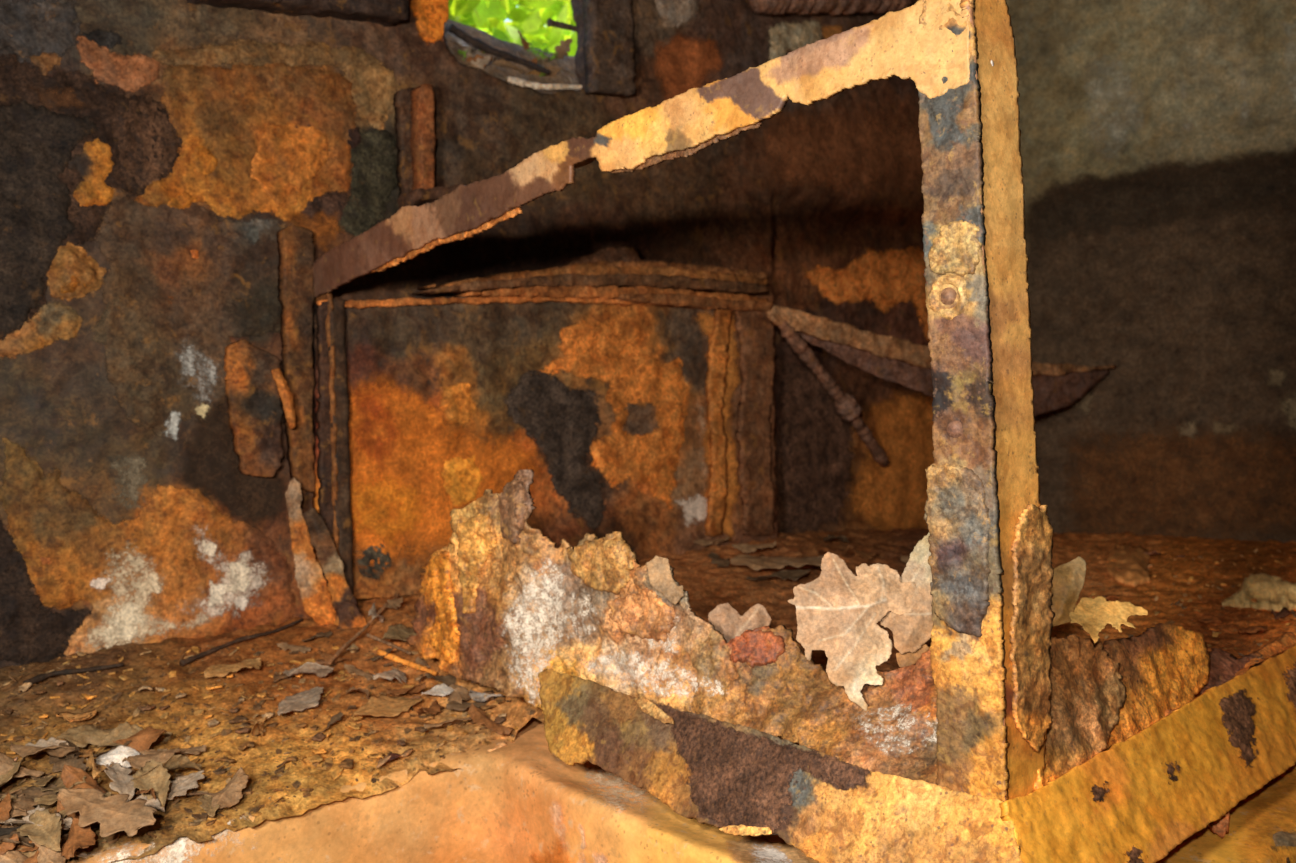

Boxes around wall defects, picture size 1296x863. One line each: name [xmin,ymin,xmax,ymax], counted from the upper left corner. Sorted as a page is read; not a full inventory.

rust [0,36,396,437]
rust [348,379,535,569]
rust [539,320,689,509]
rust [698,313,740,537]
damp [86,529,267,651]